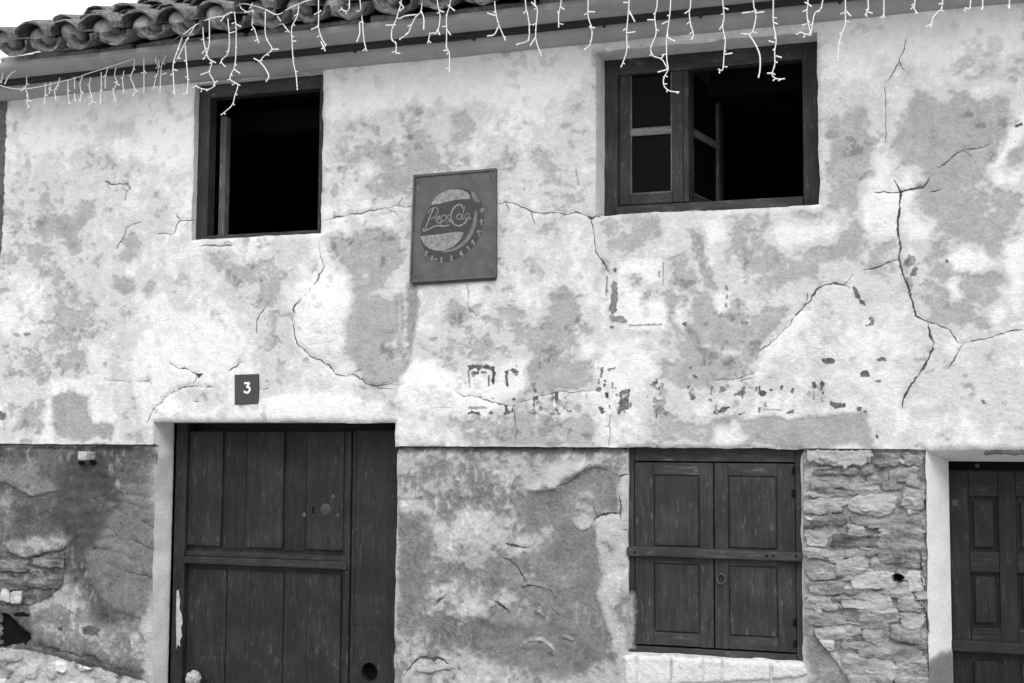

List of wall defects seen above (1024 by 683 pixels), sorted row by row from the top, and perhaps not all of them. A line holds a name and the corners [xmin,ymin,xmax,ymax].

crack [503,201,609,272]
crack [292,247,400,389]
leakage [396,285,419,351]
peeling [605,268,663,328]
crack [717,144,1022,408]
crack [111,363,239,422]
peeling [467,396,516,417]
peeling [596,366,632,414]
peeling [687,365,794,415]
spalling [807,381,867,412]
crack [590,474,628,530]
flaking render [0,552,78,617]